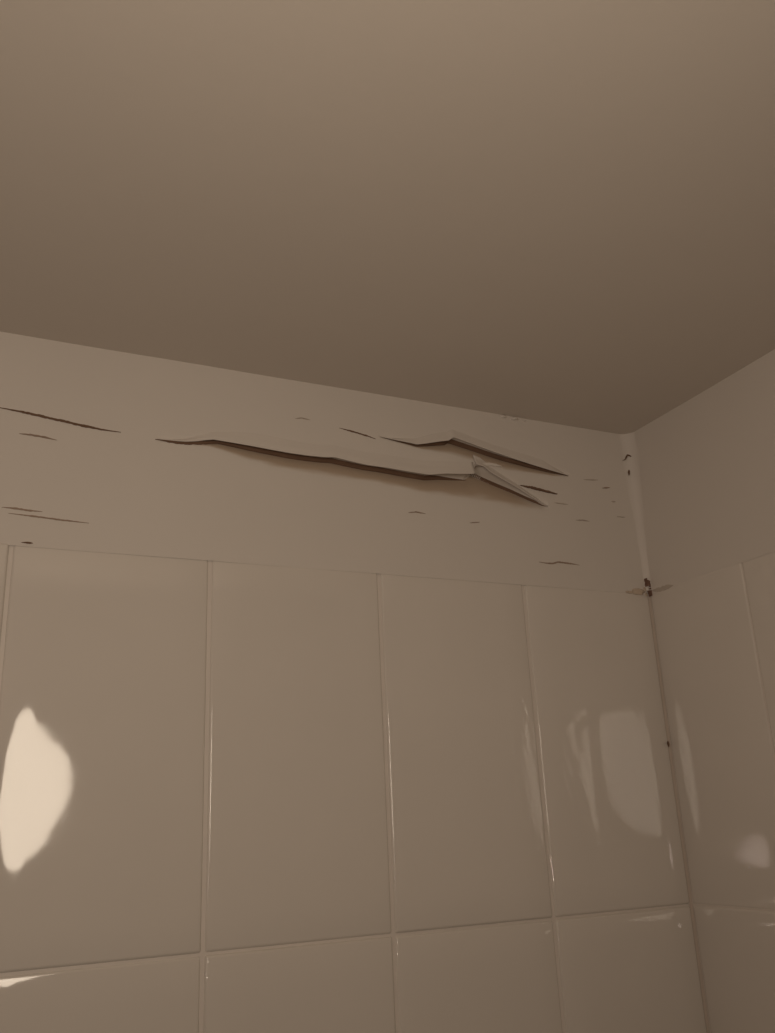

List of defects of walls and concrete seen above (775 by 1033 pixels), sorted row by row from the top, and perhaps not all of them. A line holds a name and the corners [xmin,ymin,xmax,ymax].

crack [0,407,118,440]
peeling [155,429,568,511]